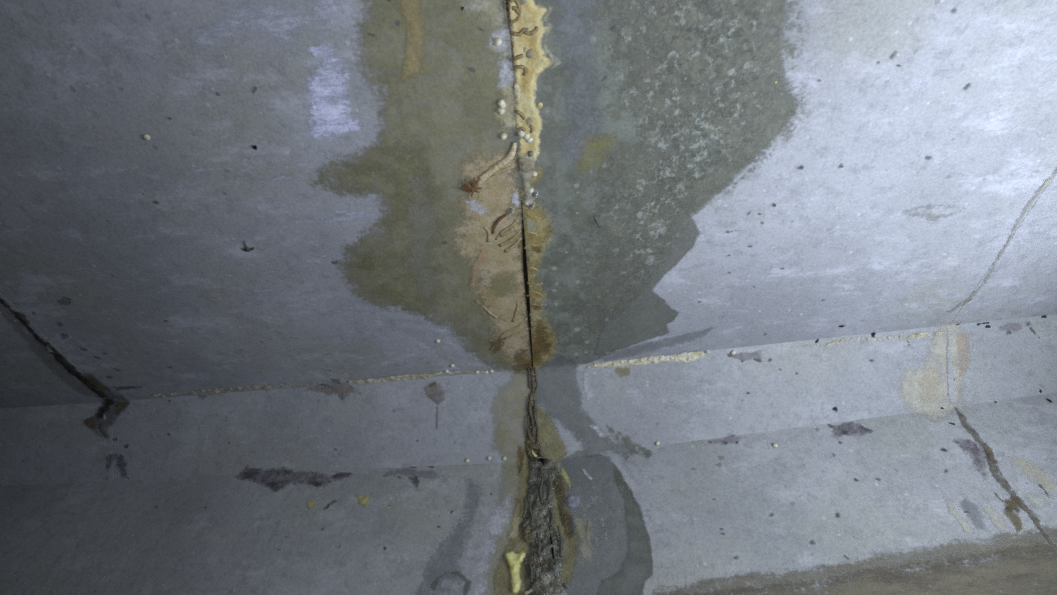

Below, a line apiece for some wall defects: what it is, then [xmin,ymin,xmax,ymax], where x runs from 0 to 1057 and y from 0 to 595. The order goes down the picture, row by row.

crack [505,0,515,104]
crack [0,298,108,398]
crack [521,198,533,367]
leakage [308,0,803,595]
spalling [237,467,351,492]
crack [956,408,1054,545]
leakage [656,528,1057,595]